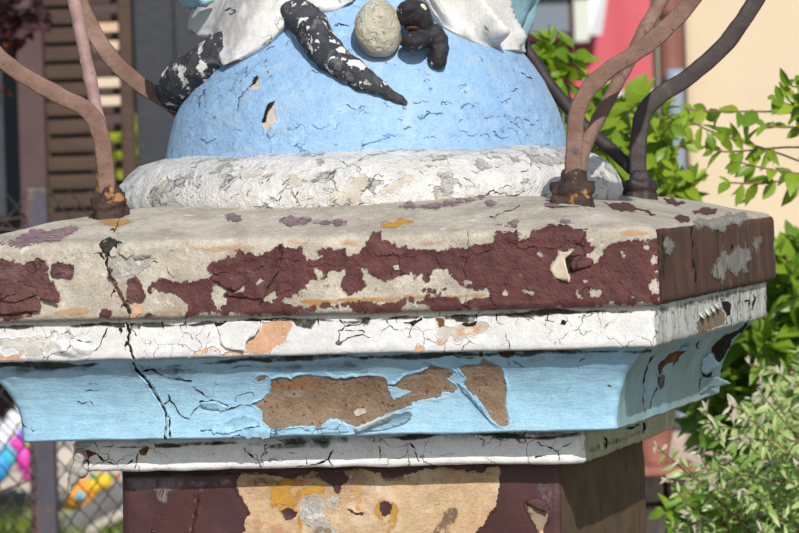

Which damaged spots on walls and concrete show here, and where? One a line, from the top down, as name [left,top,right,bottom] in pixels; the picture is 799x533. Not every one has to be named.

peeling [260,100,280,139]
peeling [322,173,497,210]
peeling [0,225,81,249]
peeling [278,215,347,228]
peeling [711,236,762,284]
peeling [0,257,75,322]
crack [77,218,333,468]
crack [317,316,412,343]
peeling [99,219,675,447]
peeling [695,295,749,394]
crack [86,453,140,472]
peeling [234,464,504,533]